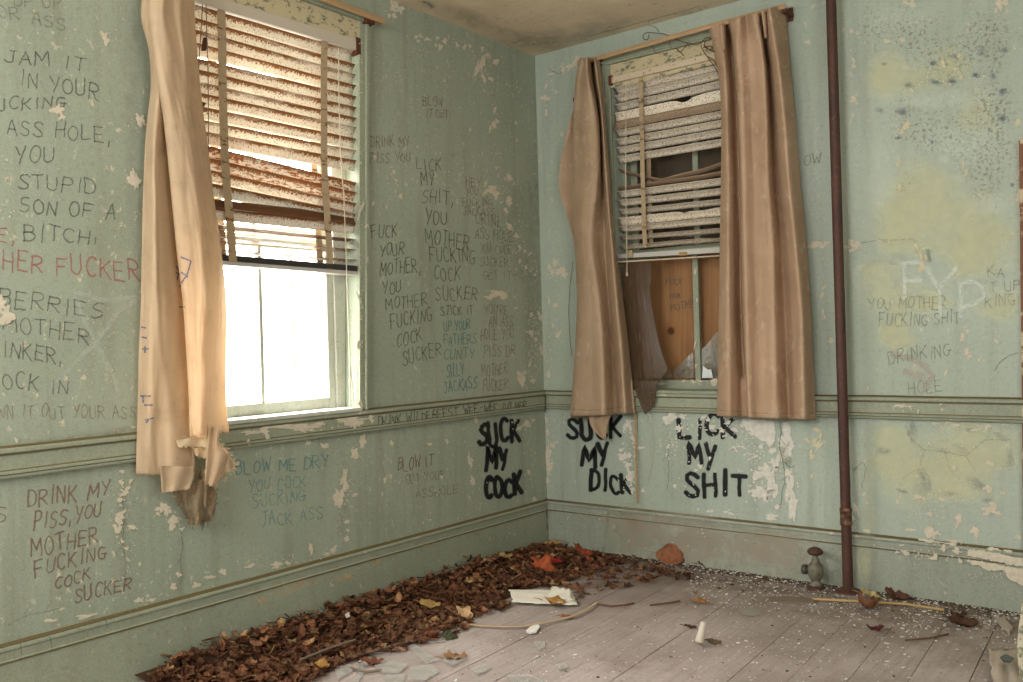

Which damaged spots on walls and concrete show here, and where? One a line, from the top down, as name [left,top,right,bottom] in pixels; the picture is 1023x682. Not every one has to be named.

water stain [894,14,1007,191]
peeling [357,34,579,391]
peeling [107,467,139,585]
peeling [112,572,182,609]
peeling [226,399,393,569]
peeling [617,418,649,494]
peeling [659,412,823,522]
peeling [882,421,1023,586]